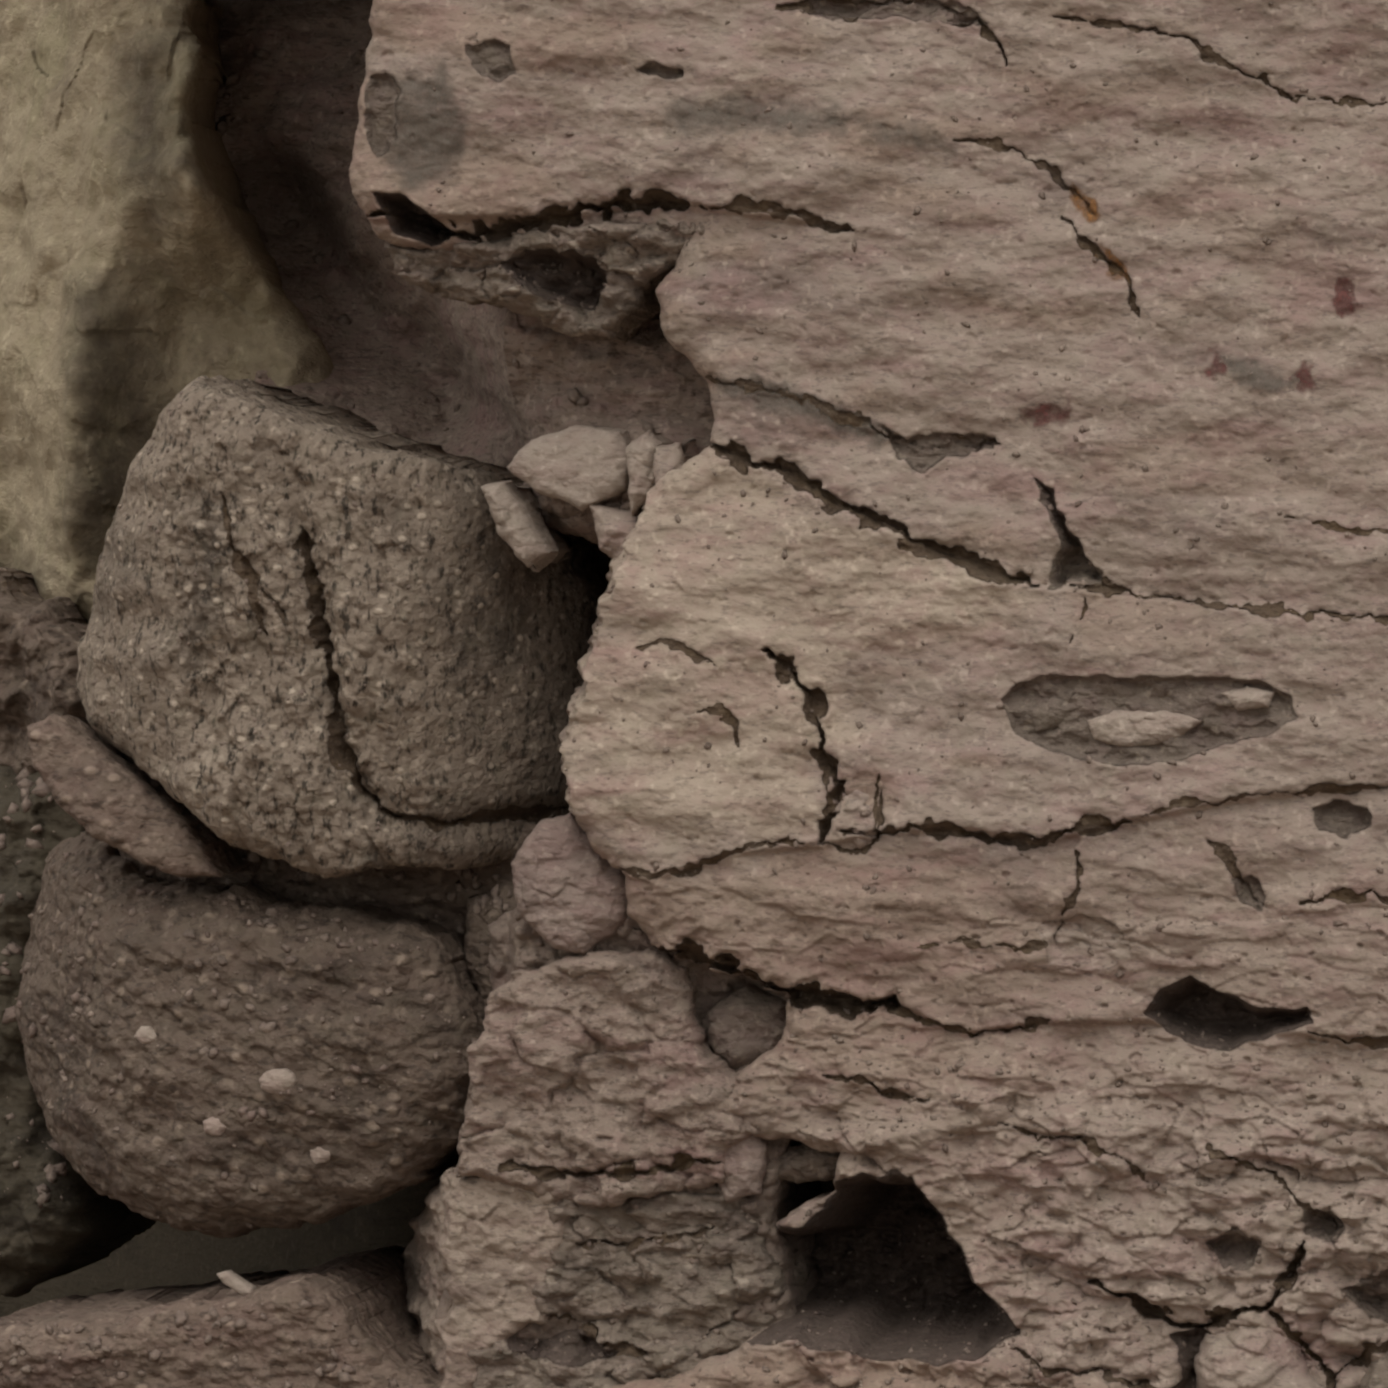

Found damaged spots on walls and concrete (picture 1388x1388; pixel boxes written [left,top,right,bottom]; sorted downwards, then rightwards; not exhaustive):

crack [775,0,1008,66]
crack [1053,16,1387,108]
crack [369,188,854,243]
crack [710,440,1388,643]
crack [636,638,715,665]
crack [619,648,1388,954]